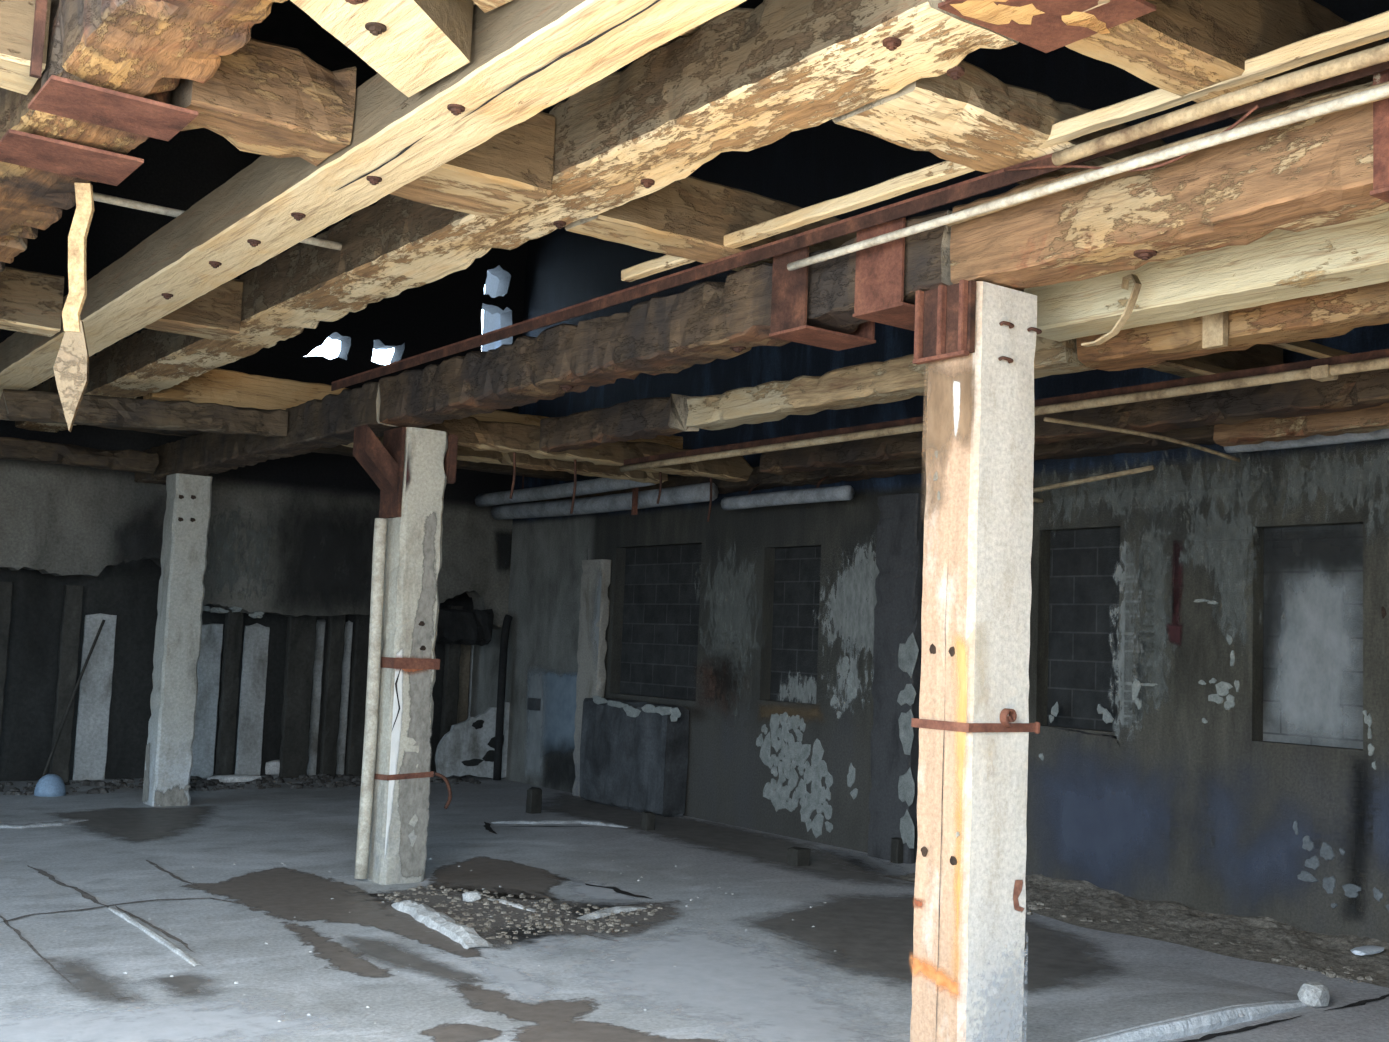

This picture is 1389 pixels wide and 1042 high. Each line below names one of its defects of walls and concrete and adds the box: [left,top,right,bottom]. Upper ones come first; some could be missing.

spalling [462,720,504,766]
peeling [756,712,858,838]
peeling [830,656,857,719]
peeling [897,632,919,848]
peeling [1049,702,1059,723]
peeling [1097,704,1114,724]
peeling [1132,679,1158,710]
peeling [1198,634,1240,710]
water stain [542,795,914,982]
water stain [183,867,720,1042]
water stain [1023,920,1116,991]